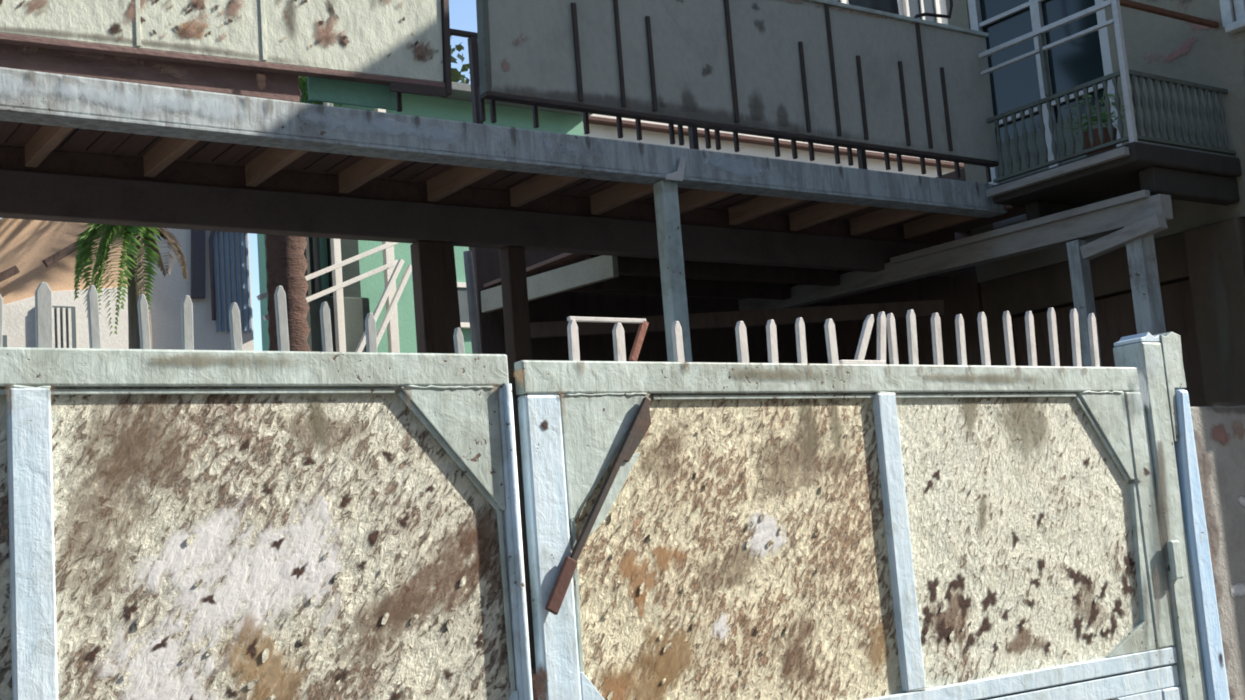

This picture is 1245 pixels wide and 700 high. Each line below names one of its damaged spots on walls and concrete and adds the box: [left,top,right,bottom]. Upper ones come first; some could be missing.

spalling [1194,422,1245,601]
spalling [1220,643,1230,667]